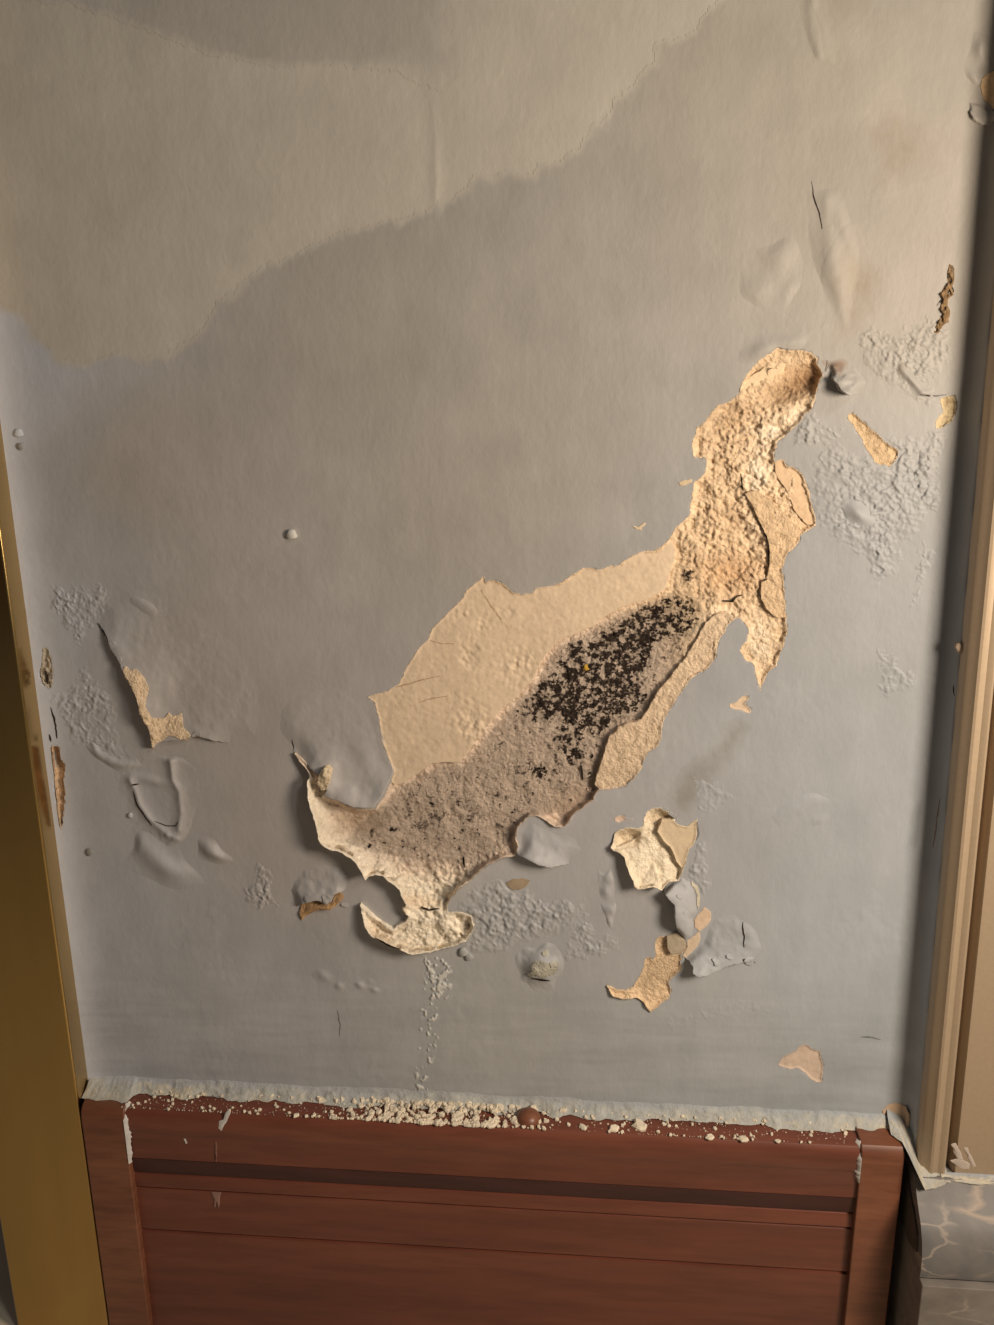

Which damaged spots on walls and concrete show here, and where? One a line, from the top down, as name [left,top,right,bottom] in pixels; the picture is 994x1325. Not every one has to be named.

damp [27,0,470,92]
spalling [934,264,954,334]
peeling [847,413,899,467]
spalling [40,647,53,689]
peeling [98,587,260,748]
spalling [280,348,866,955]
spalling [51,745,66,830]
damp [347,591,705,864]
damp [664,715,753,823]
spalling [606,807,762,1012]
damp [417,955,453,1066]
peeling [777,1044,823,1082]